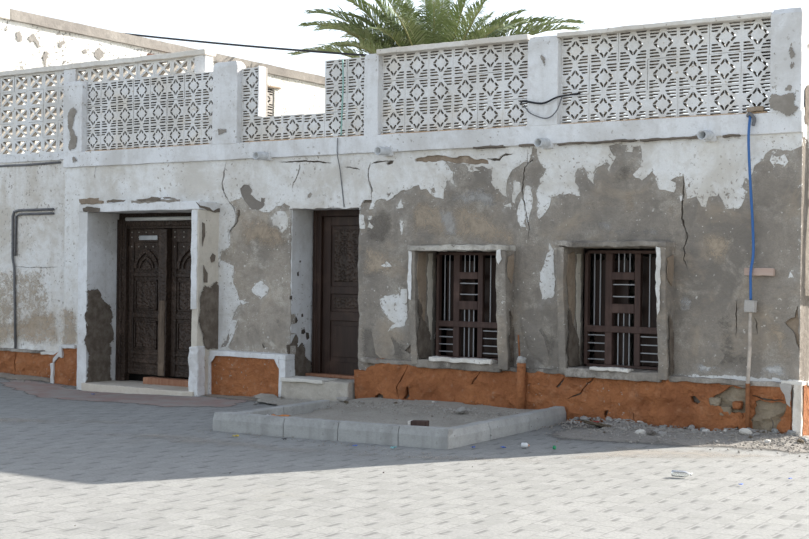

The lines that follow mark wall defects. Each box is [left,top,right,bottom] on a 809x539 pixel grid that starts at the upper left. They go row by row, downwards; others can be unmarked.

peeling [16,31,49,67]
peeling [67,107,77,163]
peeling [769,84,809,126]
peeling [199,185,312,376]
peeling [358,136,809,434]
peeling [84,289,114,383]